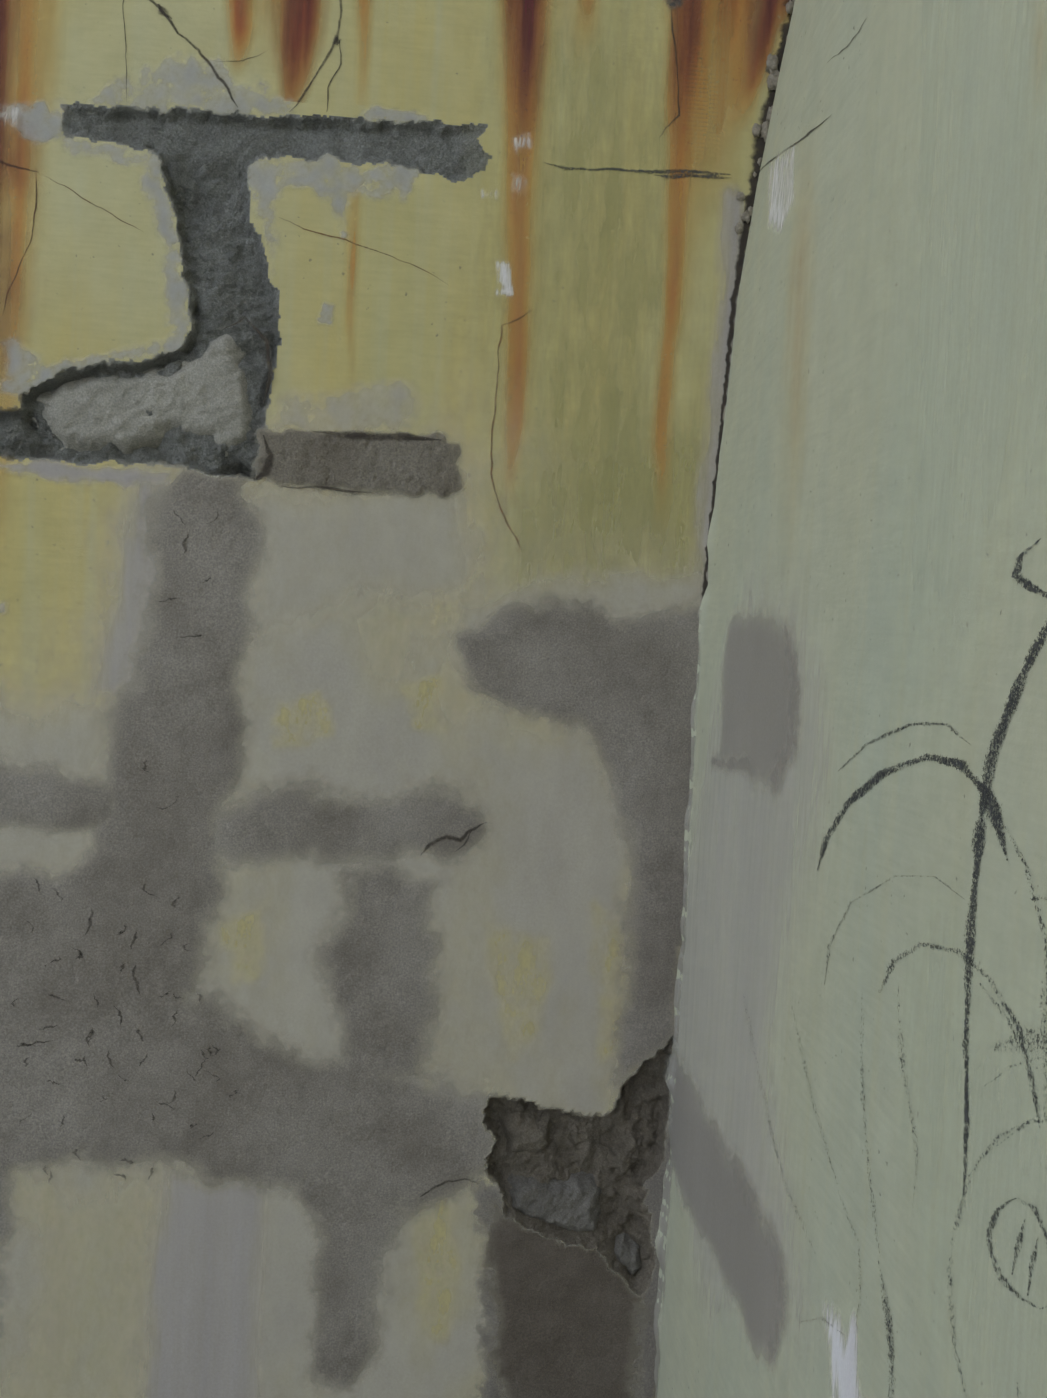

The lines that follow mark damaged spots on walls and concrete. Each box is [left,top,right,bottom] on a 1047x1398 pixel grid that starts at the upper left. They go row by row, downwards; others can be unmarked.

rust [0,0,37,321]
crack [0,160,138,316]
crack [122,0,266,107]
rust [229,0,252,60]
rust [280,0,320,102]
crack [294,0,342,110]
rust [505,0,546,467]
rust [656,0,789,469]
crack [702,0,830,599]
spalling [481,1036,674,1297]
water stain [666,1051,787,1358]